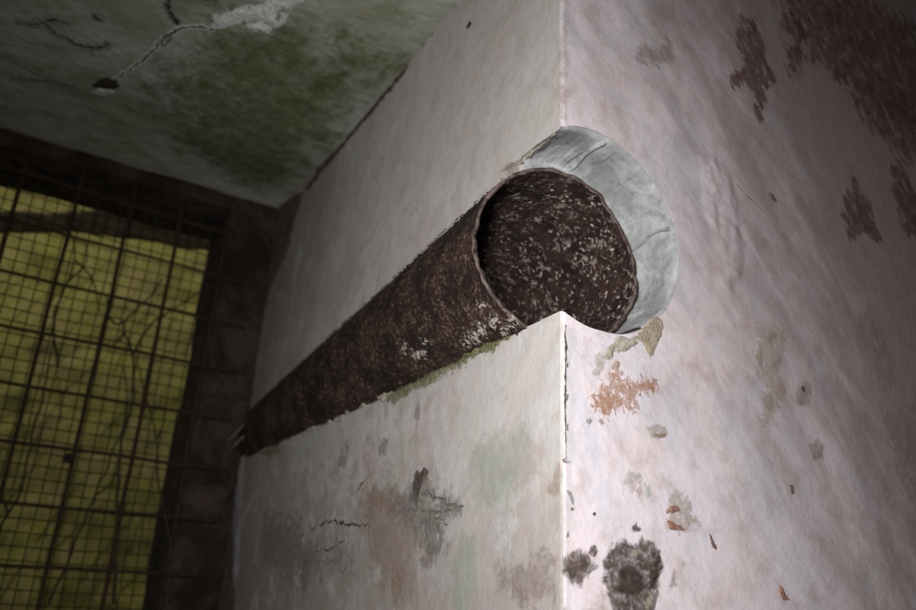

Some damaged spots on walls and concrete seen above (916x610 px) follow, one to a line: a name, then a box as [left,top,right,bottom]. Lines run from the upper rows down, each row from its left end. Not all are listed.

crack [15,12,116,52]
crack [111,0,312,80]
crack [305,32,434,193]
spalling [594,316,664,374]
water stain [386,468,464,565]
water stain [562,545,597,586]